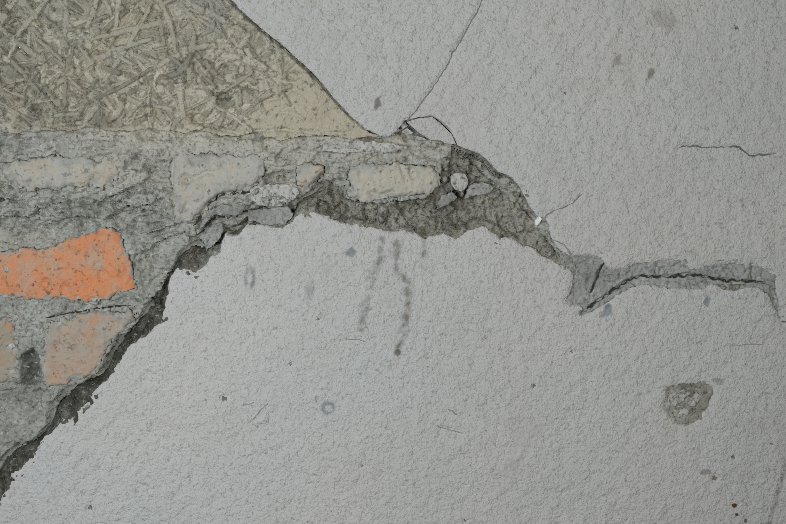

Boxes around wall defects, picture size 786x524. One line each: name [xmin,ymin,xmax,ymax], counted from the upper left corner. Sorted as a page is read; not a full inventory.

crack [407,0,482,128]
crack [679,145,775,157]
spalling [0,0,563,501]
spalling [559,252,779,316]
peeling [661,381,713,426]